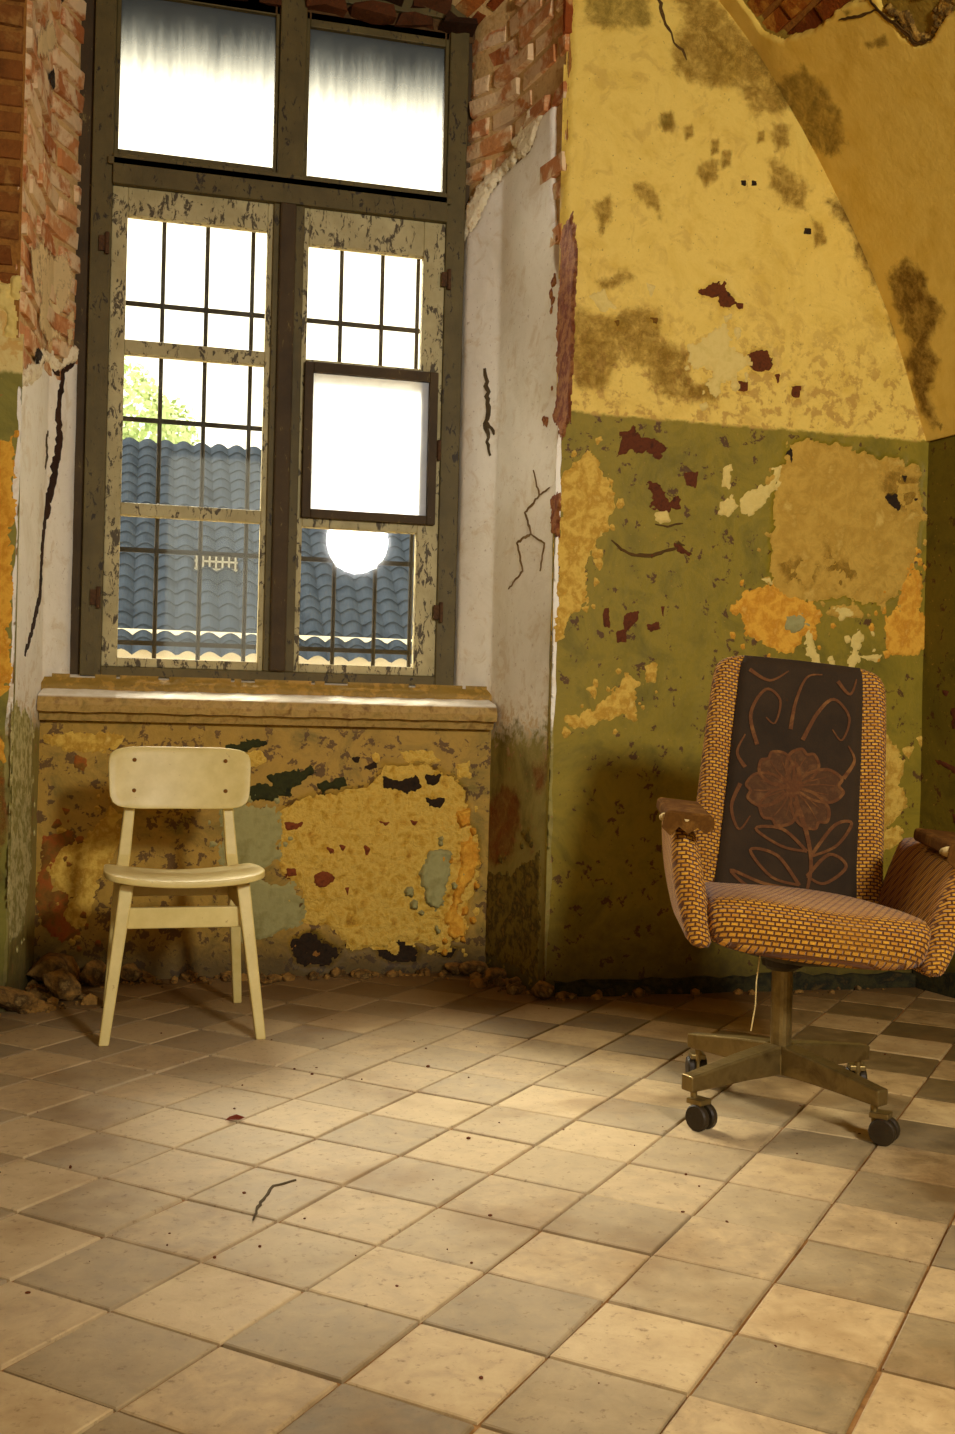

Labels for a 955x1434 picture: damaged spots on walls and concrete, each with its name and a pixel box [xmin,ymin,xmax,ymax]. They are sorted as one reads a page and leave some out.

leakage [588,0,649,27]
leakage [677,0,840,154]
crack [839,0,931,45]
crack [483,368,495,456]
leakage [574,311,714,399]
leakage [891,263,938,417]
crack [24,361,77,657]
crack [508,470,550,589]
spalling [718,438,928,667]
peeling [0,430,125,953]
peeling [562,662,658,738]
spalling [208,739,542,989]